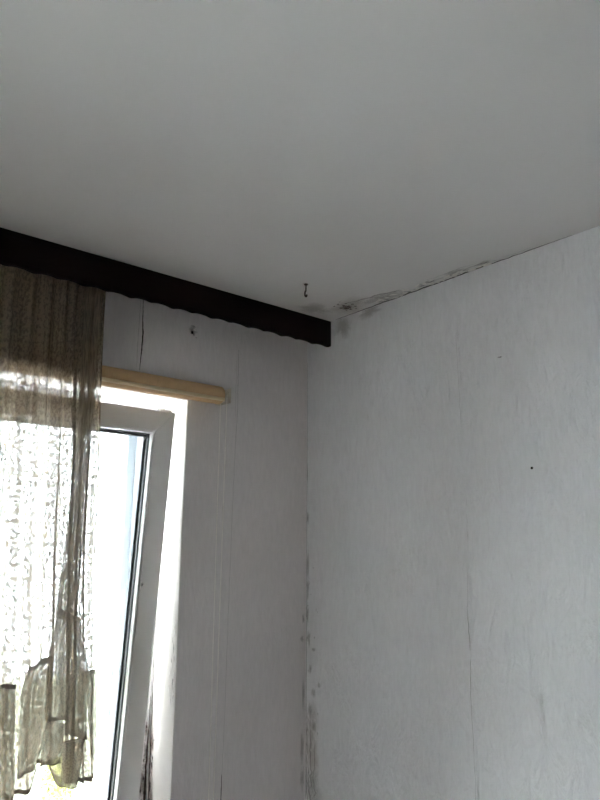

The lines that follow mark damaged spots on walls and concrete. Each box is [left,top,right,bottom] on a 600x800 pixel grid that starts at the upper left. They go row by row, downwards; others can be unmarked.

crack [138,300,146,370]
water stain [140,696,153,800]